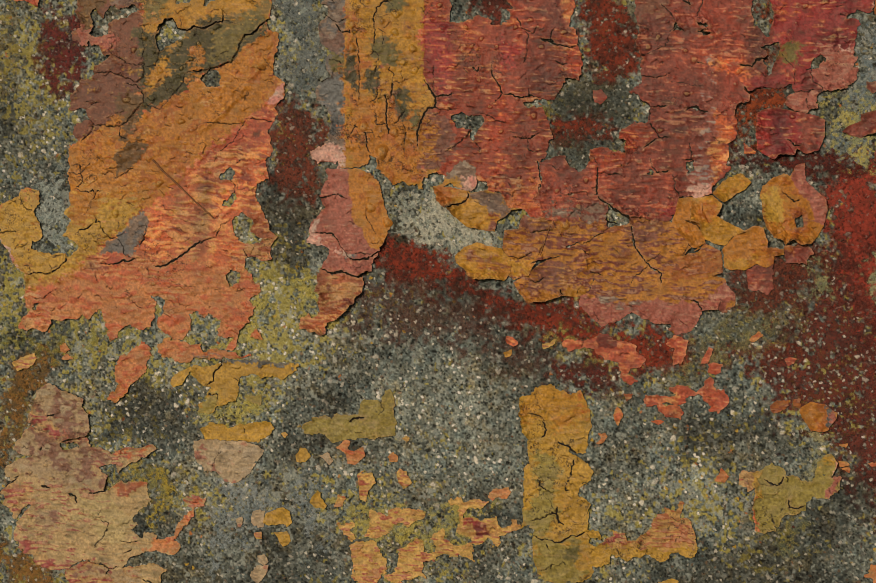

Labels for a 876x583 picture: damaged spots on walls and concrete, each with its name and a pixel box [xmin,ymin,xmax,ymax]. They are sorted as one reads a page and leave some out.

crack [416,80,452,145]
crack [491,70,541,101]
crack [73,164,115,239]
peeling [0,0,299,483]
crack [153,240,205,267]
peeling [299,0,876,425]
peeling [770,398,838,432]
peeling [0,383,206,583]
peeling [295,384,698,583]
crack [530,413,585,567]
peeling [715,454,851,534]